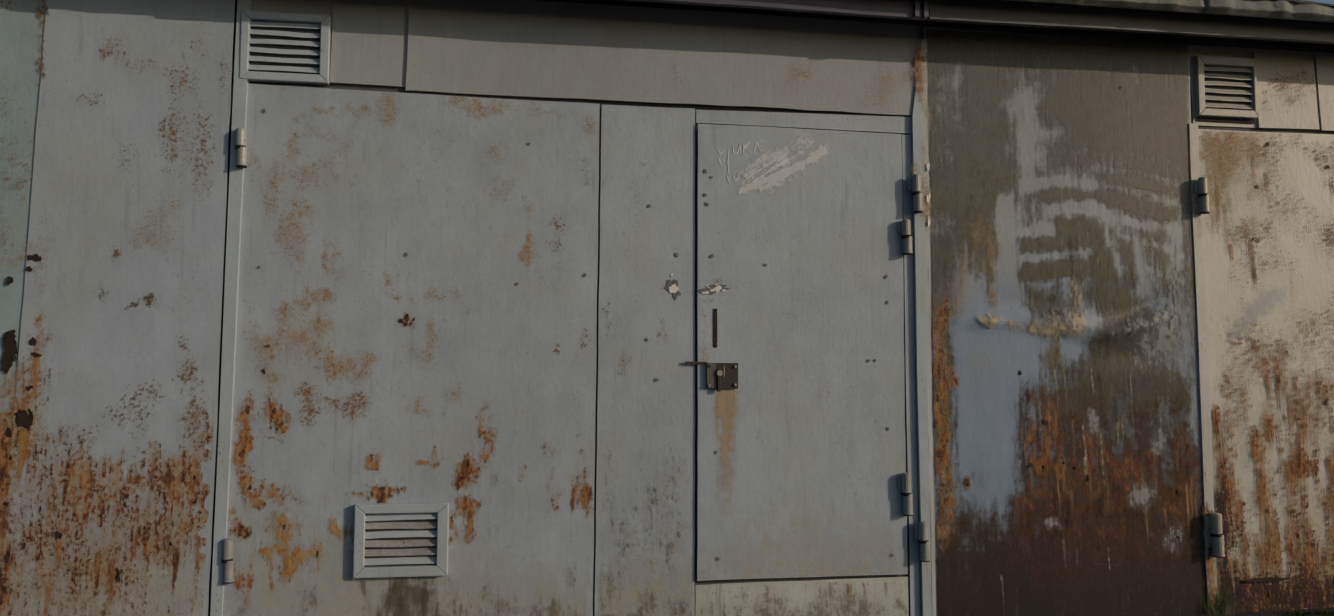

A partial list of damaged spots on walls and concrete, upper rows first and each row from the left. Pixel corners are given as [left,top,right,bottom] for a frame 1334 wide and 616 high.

rust [0,0,48,85]
rust [125,293,157,310]
rust [386,280,459,361]
rust [932,132,1334,613]
rust [0,314,213,616]
rust [230,240,381,600]
rust [353,453,406,503]
rust [448,405,496,544]
rust [717,390,736,464]